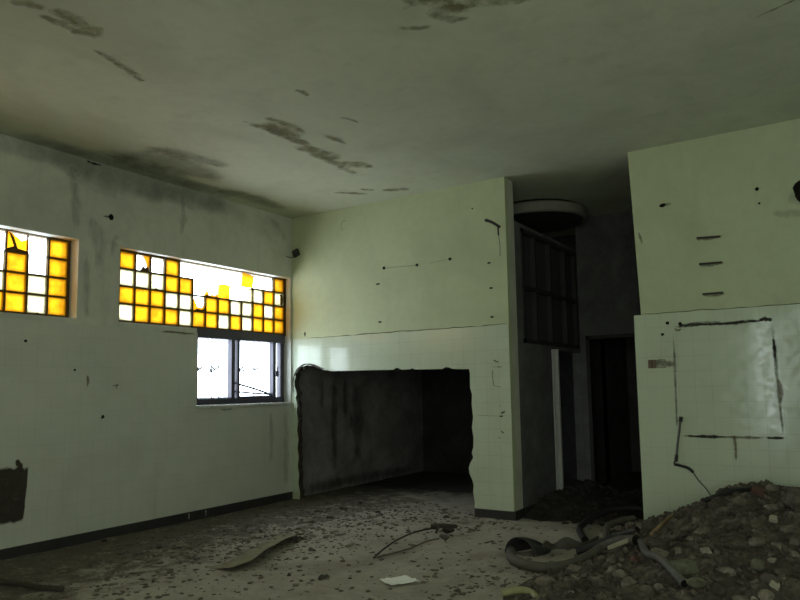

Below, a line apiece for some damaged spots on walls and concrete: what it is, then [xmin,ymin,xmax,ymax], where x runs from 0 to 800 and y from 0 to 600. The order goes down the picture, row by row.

peeling [0,460,28,524]
spalling [292,364,362,498]